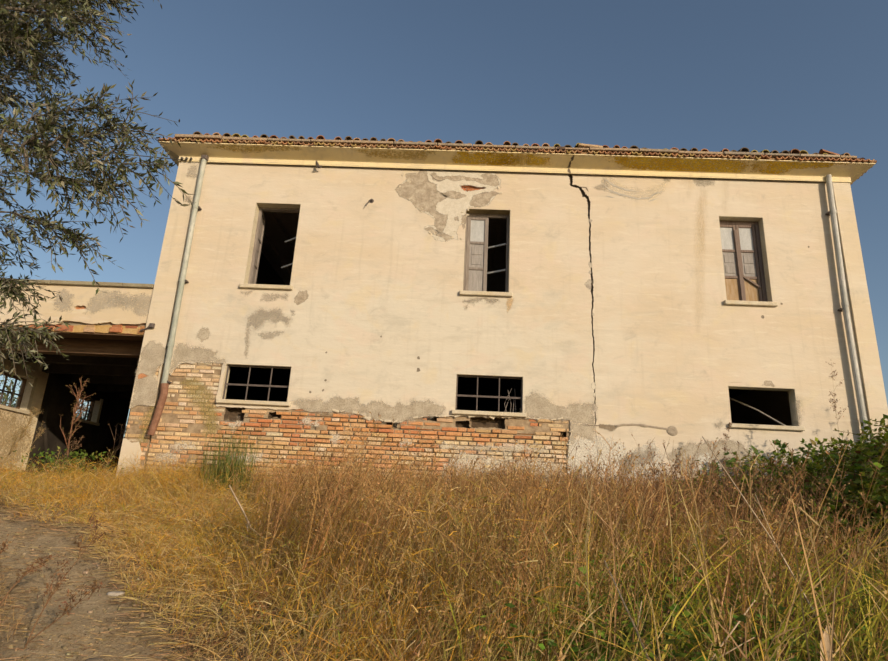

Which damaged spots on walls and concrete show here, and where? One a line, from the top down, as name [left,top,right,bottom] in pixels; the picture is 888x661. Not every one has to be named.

flaking render [395,169,502,242]
flaking render [55,290,152,316]
flaking render [294,291,308,305]
crack [567,155,600,465]
flaking render [125,342,664,495]